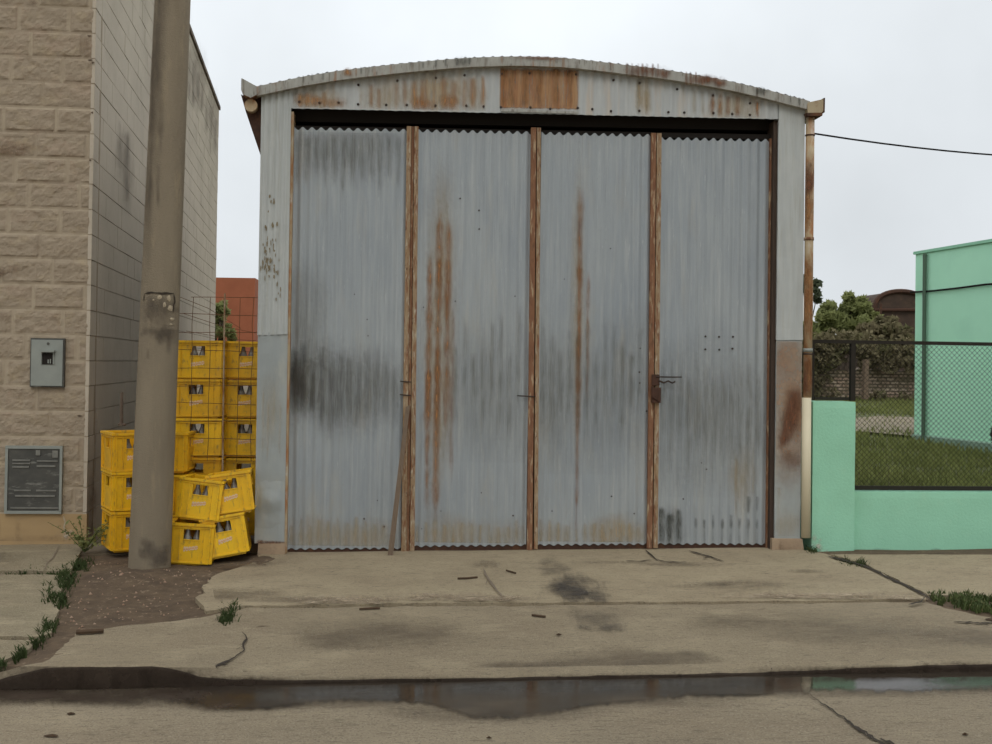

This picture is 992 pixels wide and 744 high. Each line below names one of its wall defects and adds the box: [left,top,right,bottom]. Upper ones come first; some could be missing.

rust [500,57,578,109]
rust [686,73,725,86]
rust [426,222,450,498]
rust [776,343,812,456]
crack [829,556,931,604]
crack [811,695,895,744]